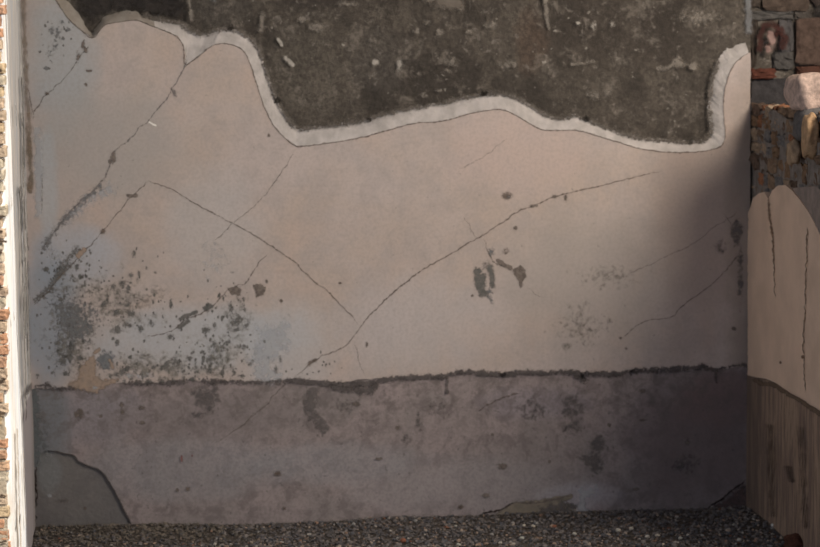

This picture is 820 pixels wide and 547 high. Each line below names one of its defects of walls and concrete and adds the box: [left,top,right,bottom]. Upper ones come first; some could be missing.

crack [33,40,87,118]
flaking render [67,0,752,149]
damp [11,12,47,468]
damp [39,247,293,417]
crack [33,62,657,375]
damp [471,250,495,302]
crack [768,201,776,297]
crack [800,229,808,391]
damp [303,387,329,435]
spalling [34,450,131,527]